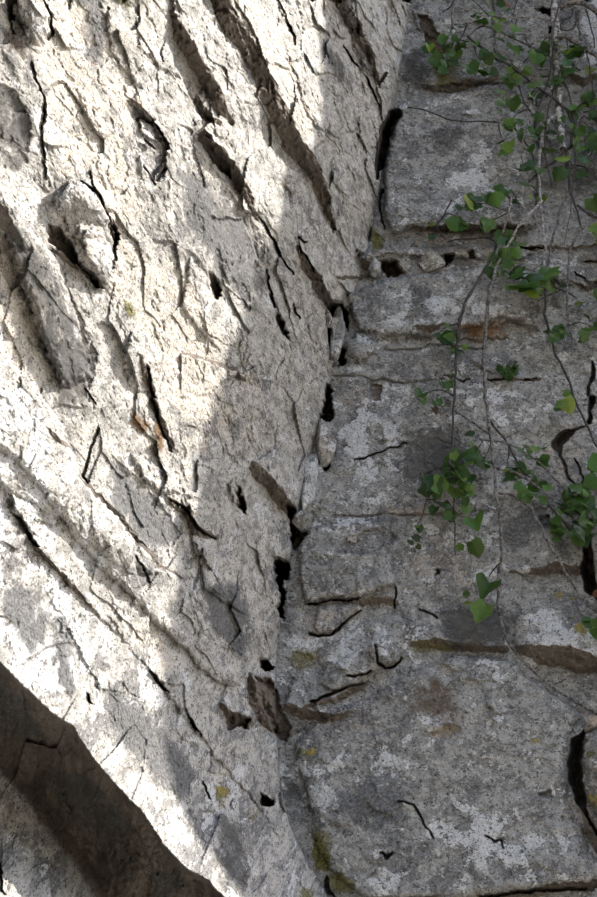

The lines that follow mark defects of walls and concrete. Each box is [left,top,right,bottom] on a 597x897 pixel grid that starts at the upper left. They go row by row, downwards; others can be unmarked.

crack [31,63,47,180]
crack [343,46,399,228]
spalling [47,224,114,289]
crack [81,171,117,269]
crack [552,361,596,484]
crack [307,597,361,637]
crack [581,542,597,599]
spalling [254,676,292,742]
crack [400,801,434,839]
crack [568,730,597,835]